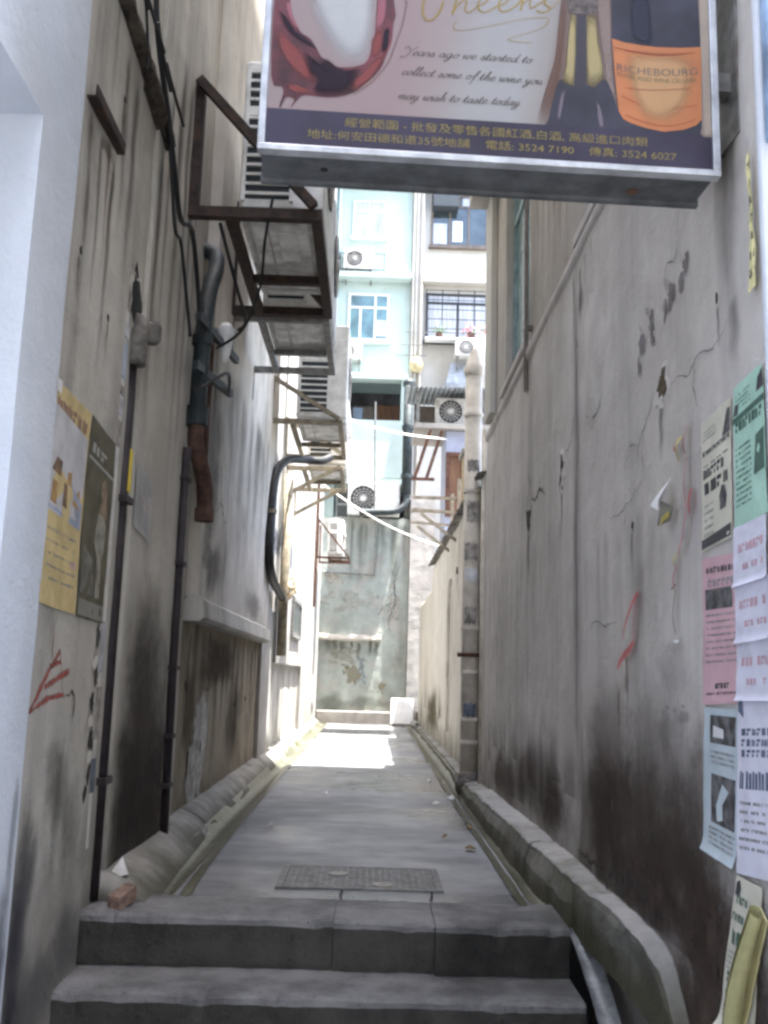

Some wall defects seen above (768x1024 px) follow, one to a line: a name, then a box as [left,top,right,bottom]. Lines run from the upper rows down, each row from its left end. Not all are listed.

peeling [637,250,688,377]
crack [565,336,615,628]
spalling [653,359,670,409]
crack [609,319,728,524]
water stain [495,759,559,821]
water stain [15,851,31,930]
water stain [589,774,732,1024]
water stain [755,969,768,1024]